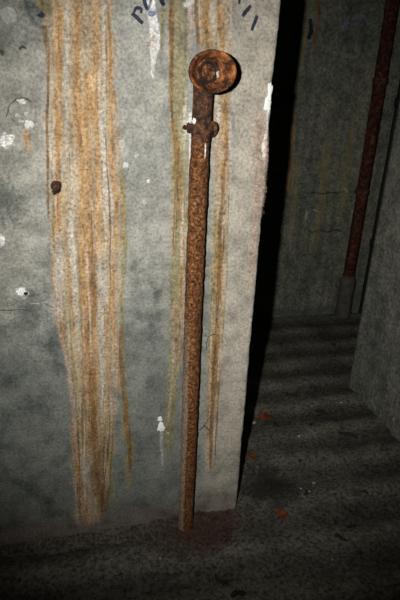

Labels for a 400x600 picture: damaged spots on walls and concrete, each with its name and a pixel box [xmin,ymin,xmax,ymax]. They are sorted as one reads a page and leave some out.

corrosion [194,0,234,55]
corrosion [42,0,133,524]
corrosion [205,88,232,474]